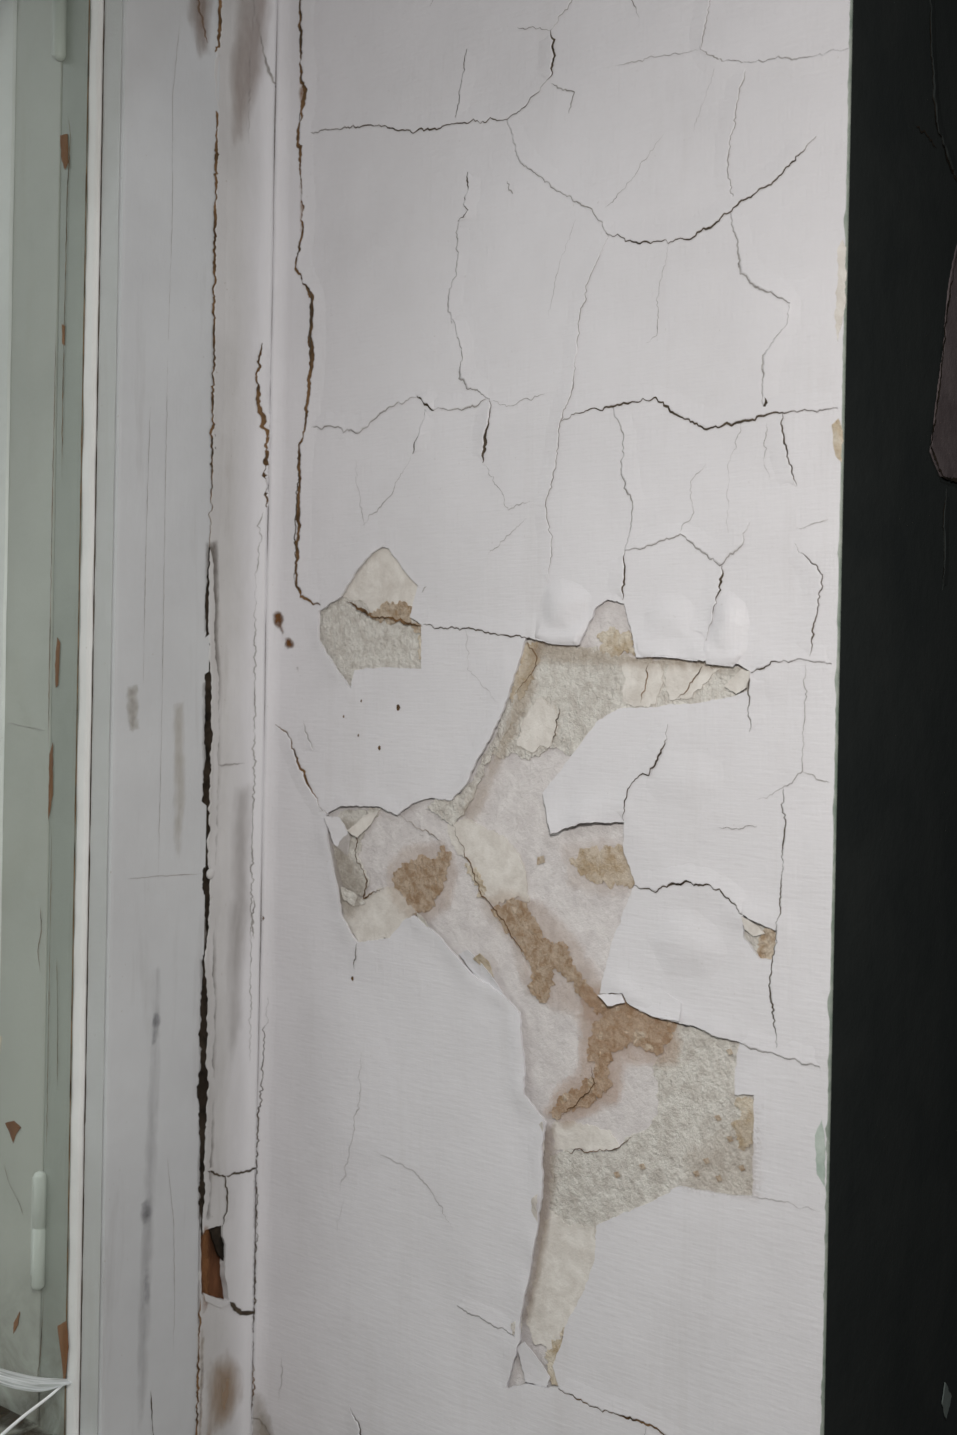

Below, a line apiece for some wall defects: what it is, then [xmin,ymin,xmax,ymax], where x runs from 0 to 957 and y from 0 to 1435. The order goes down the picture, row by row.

peeling [930,245,957,483]
peeling [320,547,422,686]
crack [131,0,837,1435]
peeling [324,600,763,1387]
peeling [741,915,776,959]
spalling [200,1226,230,1308]
peeling [942,1382,952,1420]